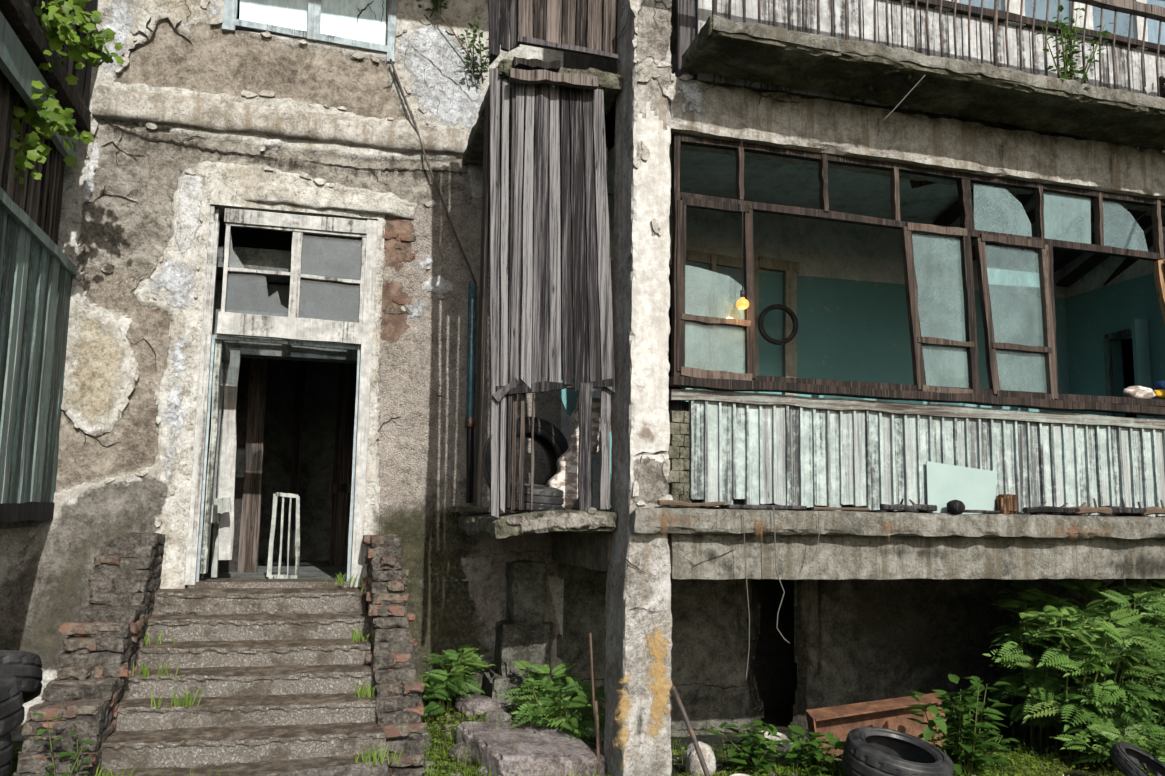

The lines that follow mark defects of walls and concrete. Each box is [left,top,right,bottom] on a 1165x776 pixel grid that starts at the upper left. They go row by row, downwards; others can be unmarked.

crack [121,0,192,56]
peeling [99,0,484,132]
spalling [628,0,704,112]
peeling [632,141,650,169]
peeling [650,218,662,236]
peeling [55,118,562,532]
spalling [632,457,673,505]
leakage [376,495,494,713]
peeling [461,507,607,642]
corrosion [616,675,631,756]
corrosion [647,628,671,735]